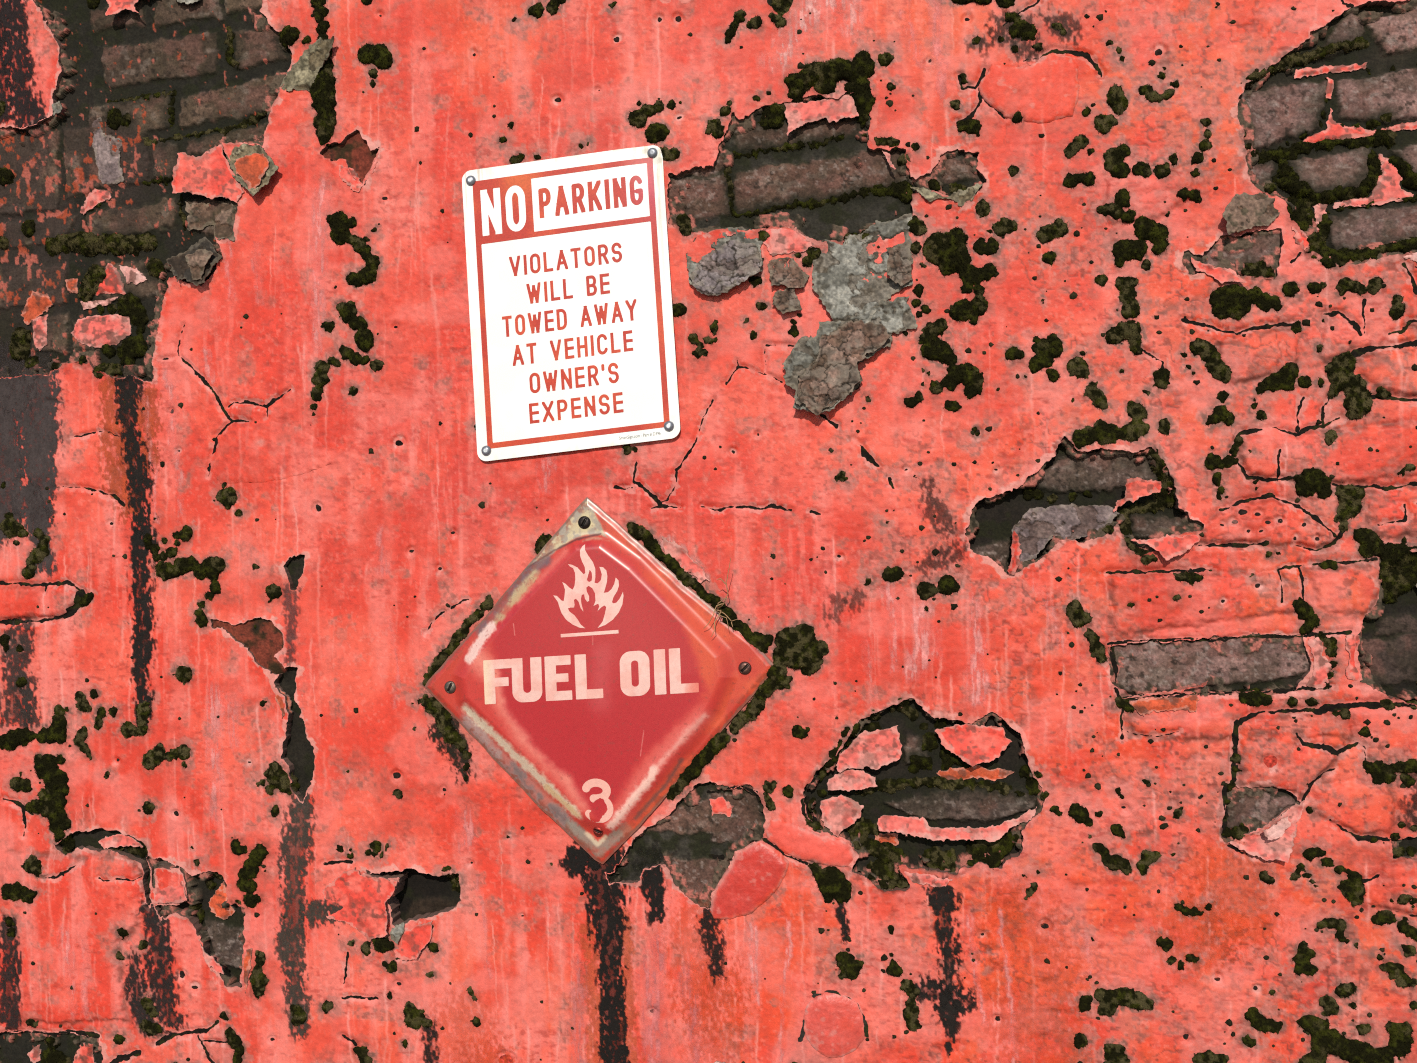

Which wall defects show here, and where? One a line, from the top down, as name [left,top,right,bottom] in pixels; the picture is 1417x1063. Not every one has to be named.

leakage [114,374,158,727]
spalling [0,0,334,382]
crack [163,324,291,476]
crack [613,344,821,515]
spalling [668,93,986,415]
crack [1106,396,1417,883]
crack [1181,262,1417,358]
spalling [1182,0,1417,284]
leakage [275,793,345,1040]
leakage [559,841,666,1063]
spalling [804,698,1044,890]
leakage [915,876,985,1054]